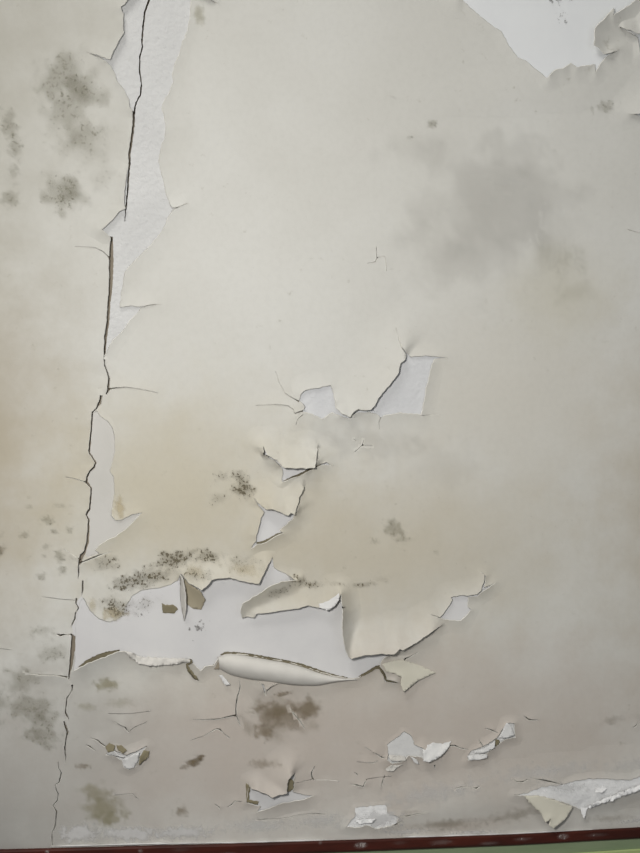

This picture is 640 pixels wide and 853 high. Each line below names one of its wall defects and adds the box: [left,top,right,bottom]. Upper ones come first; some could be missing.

peeling [439,0,640,133]
crack [114,0,150,217]
peeling [73,0,237,361]
peeling [70,307,508,700]
crack [0,228,167,848]
damp [103,549,216,591]
peeling [100,738,155,776]
peeling [377,727,451,775]
peeling [460,714,524,769]
peeling [339,801,406,837]
peeling [506,769,640,828]